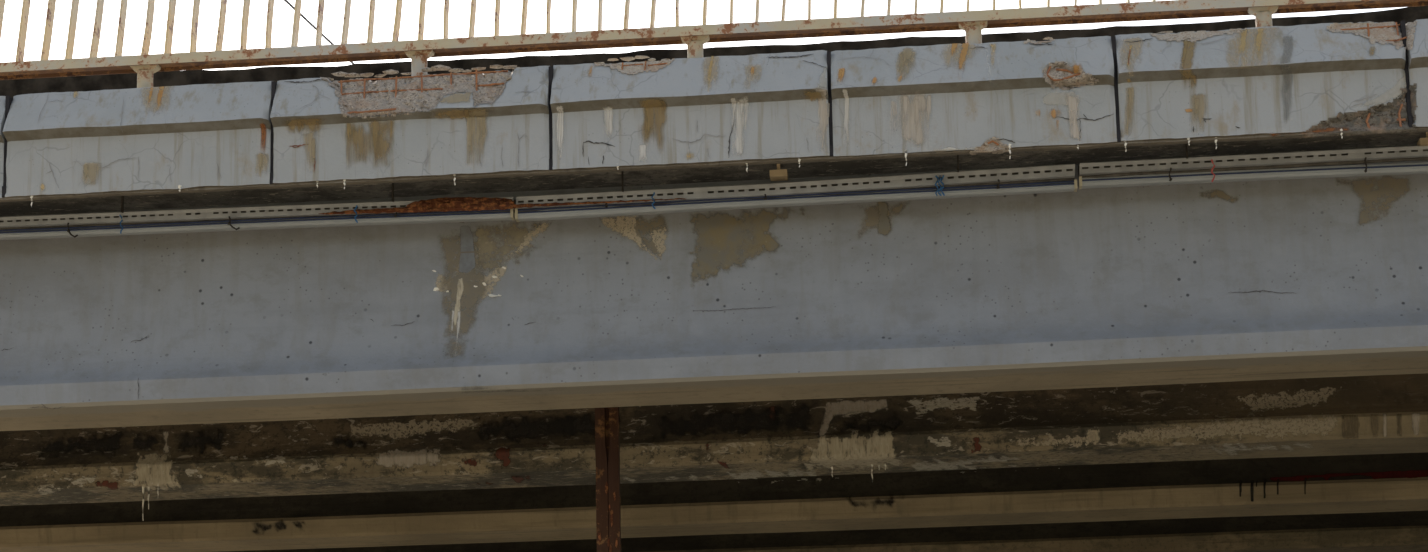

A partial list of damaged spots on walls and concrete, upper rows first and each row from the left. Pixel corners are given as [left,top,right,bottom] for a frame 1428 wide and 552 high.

spalling [1326,21,1417,50]
leakage [347,121,393,160]
spalling [320,65,517,119]
leakage [436,109,487,155]
leakage [640,99,667,159]
spalling [1042,61,1099,90]
spalling [1299,77,1418,138]
rust [319,197,685,223]
leakage [441,236,486,357]
leakage [38,429,247,490]
leakage [658,386,1420,484]